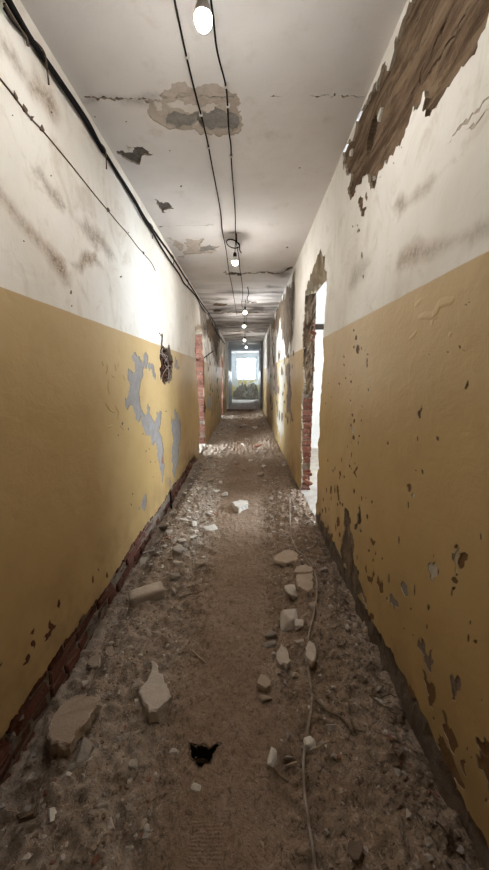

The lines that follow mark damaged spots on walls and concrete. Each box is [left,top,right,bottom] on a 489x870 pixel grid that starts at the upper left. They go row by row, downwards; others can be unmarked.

spalling [117,145,149,163]
spalling [168,238,218,257]
spalling [145,81,244,136]
spalling [345,0,489,232]
flaking render [0,348,196,785]
spalling [317,414,489,870]